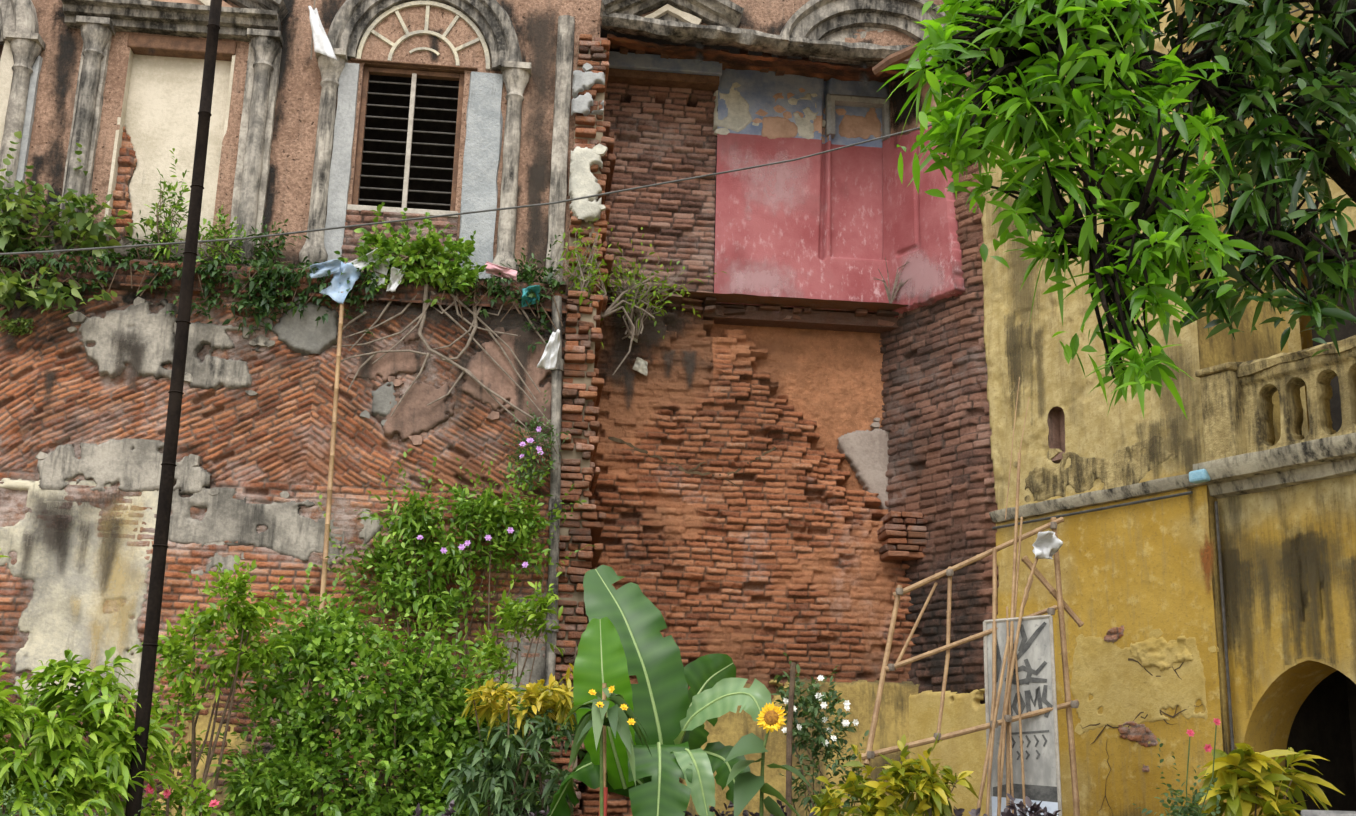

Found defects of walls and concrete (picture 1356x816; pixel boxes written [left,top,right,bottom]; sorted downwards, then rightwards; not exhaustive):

leakage [321,0,345,29]
leakage [430,30,443,60]
peeling [713,82,882,143]
flaking render [592,144,608,156]
flaking render [67,311,87,333]
flaking render [249,318,276,349]
flaking render [486,411,500,421]
flaking render [185,454,201,467]
leakage [22,492,134,672]
leakage [1221,534,1330,676]
flaking render [1104,625,1124,643]
flaking render [1118,721,1158,747]